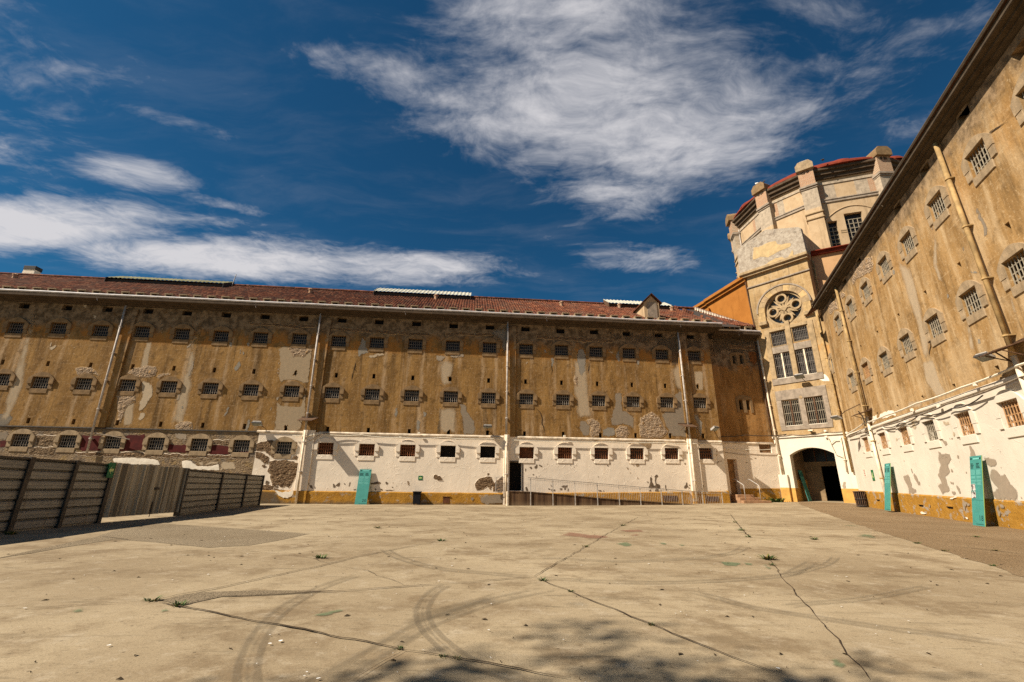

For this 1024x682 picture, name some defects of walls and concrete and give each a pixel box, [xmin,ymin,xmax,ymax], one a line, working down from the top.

spalling [74,346,313,498]
spalling [471,473,503,505]
spalling [615,412,668,449]
peeling [938,421,1022,526]